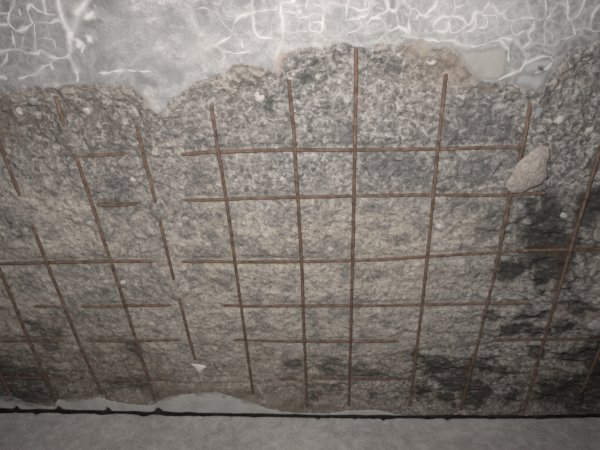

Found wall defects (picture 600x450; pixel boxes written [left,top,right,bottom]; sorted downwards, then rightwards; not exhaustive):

crack [0,0,88,82]
crack [100,68,151,76]
crack [209,0,331,70]
crack [345,0,600,73]
spalling [209,105,303,394]
spalling [287,80,353,407]
spalling [347,48,436,406]
spalling [409,74,520,410]
damp [497,188,581,295]
damp [485,311,548,336]
damp [410,352,515,407]
damp [534,336,600,415]